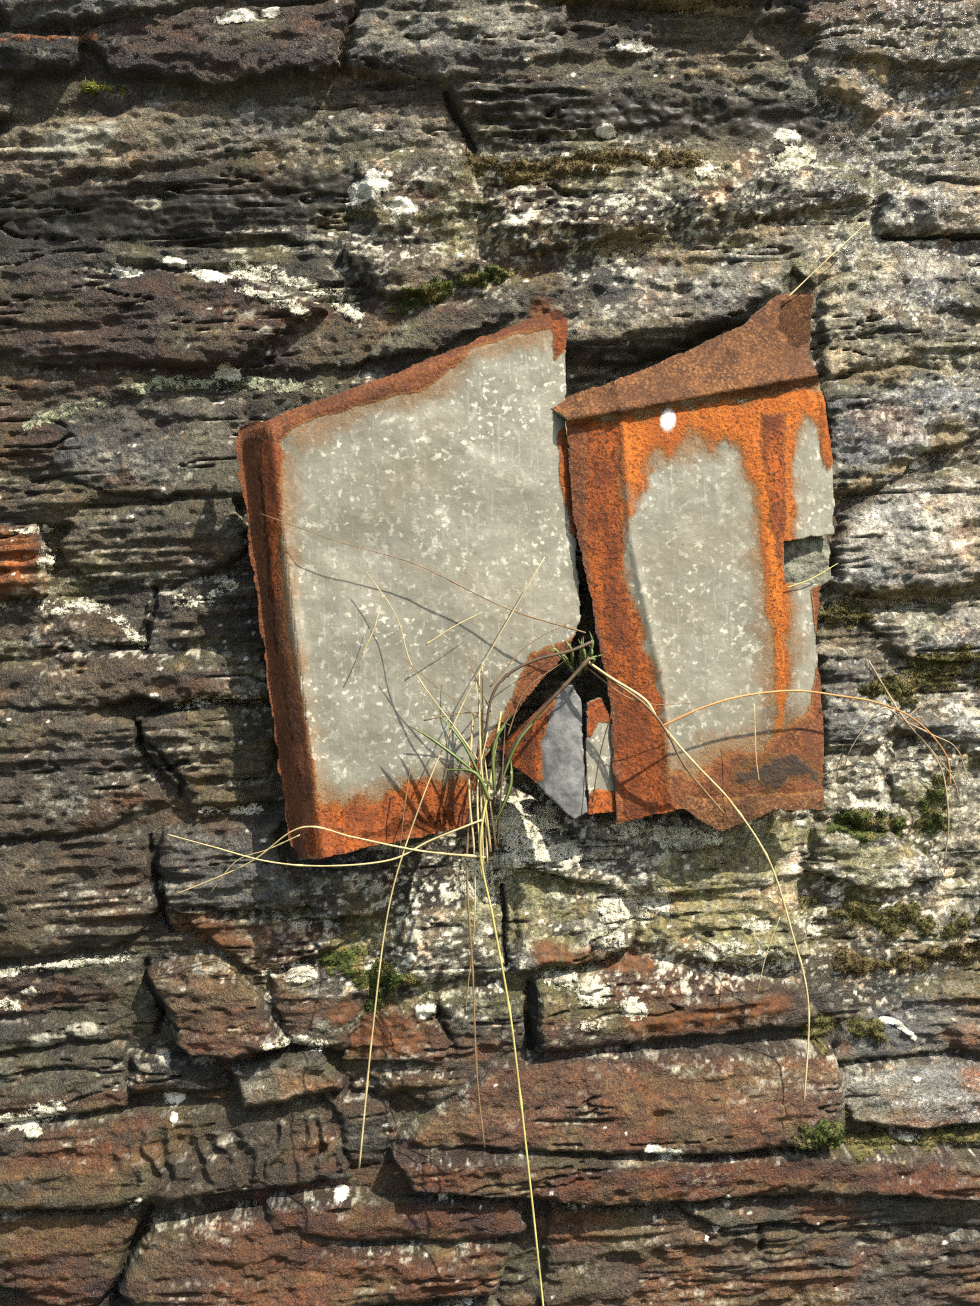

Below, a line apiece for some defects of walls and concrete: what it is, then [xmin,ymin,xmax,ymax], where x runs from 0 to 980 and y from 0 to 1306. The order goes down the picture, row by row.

rust [551,294,833,831]